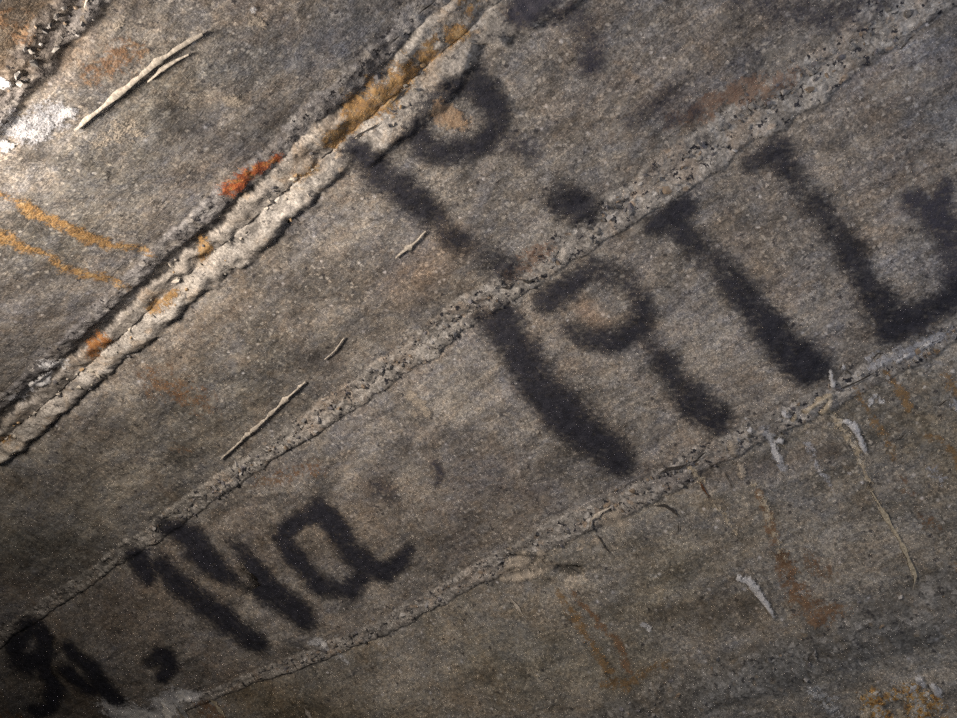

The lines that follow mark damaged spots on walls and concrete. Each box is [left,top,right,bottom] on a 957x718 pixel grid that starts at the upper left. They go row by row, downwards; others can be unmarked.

corrosion [321,0,480,151]
corrosion [219,152,283,197]
corrosion [0,193,154,257]
corrosion [0,229,130,289]
corrosion [755,489,843,627]
leakage [94,684,225,718]